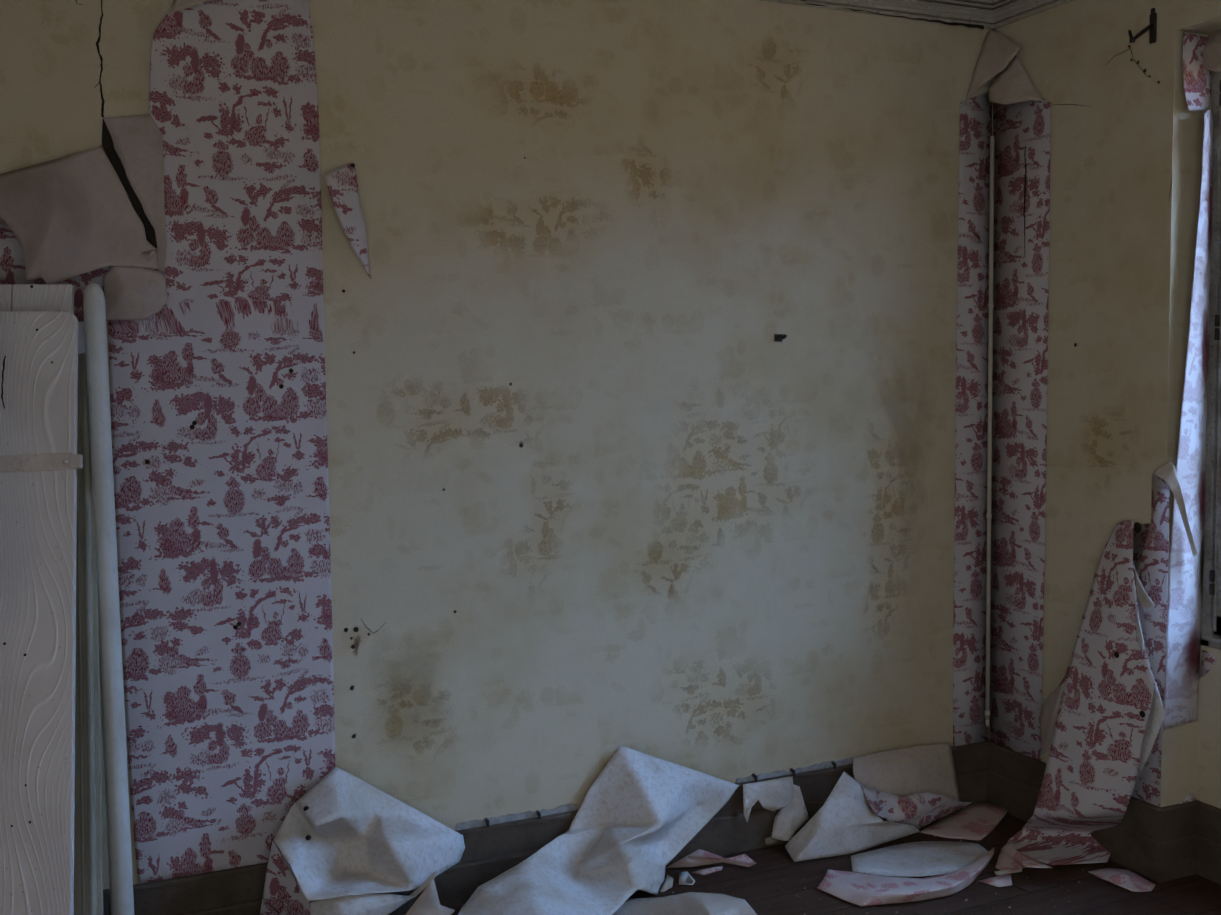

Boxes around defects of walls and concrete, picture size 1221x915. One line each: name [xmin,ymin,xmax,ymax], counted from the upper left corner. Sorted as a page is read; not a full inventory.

crack [76,0,157,248]